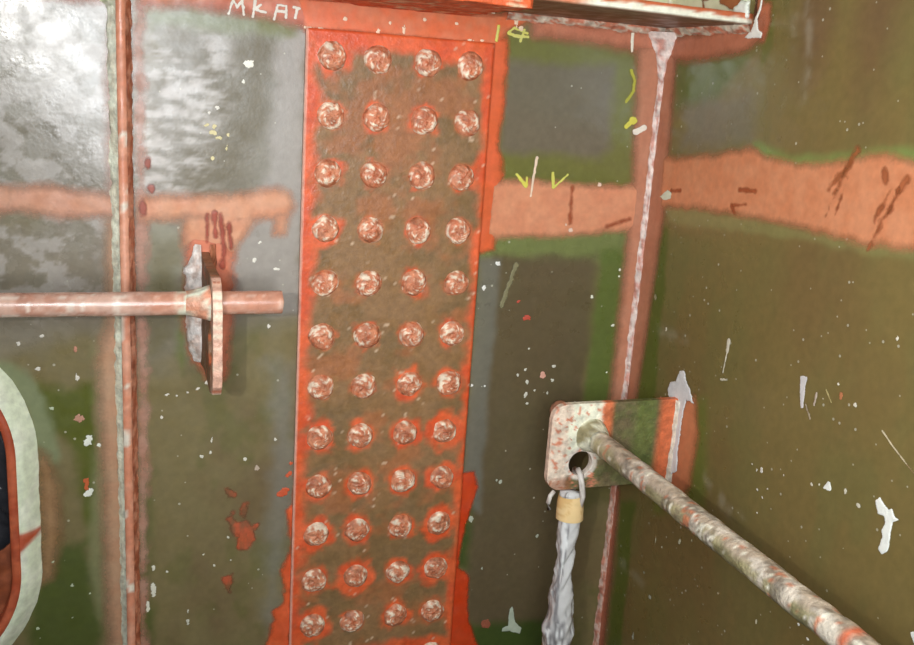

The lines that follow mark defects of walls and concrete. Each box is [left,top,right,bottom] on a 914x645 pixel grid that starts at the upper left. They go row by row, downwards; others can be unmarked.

corrosion [719,0,741,9]
corrosion [828,147,860,210]
corrosion [896,175,910,194]
corrosion [205,210,233,269]
corrosion [867,204,892,251]
corrosion [225,488,259,550]
peeling [875,497,898,554]
peeling [502,607,521,634]